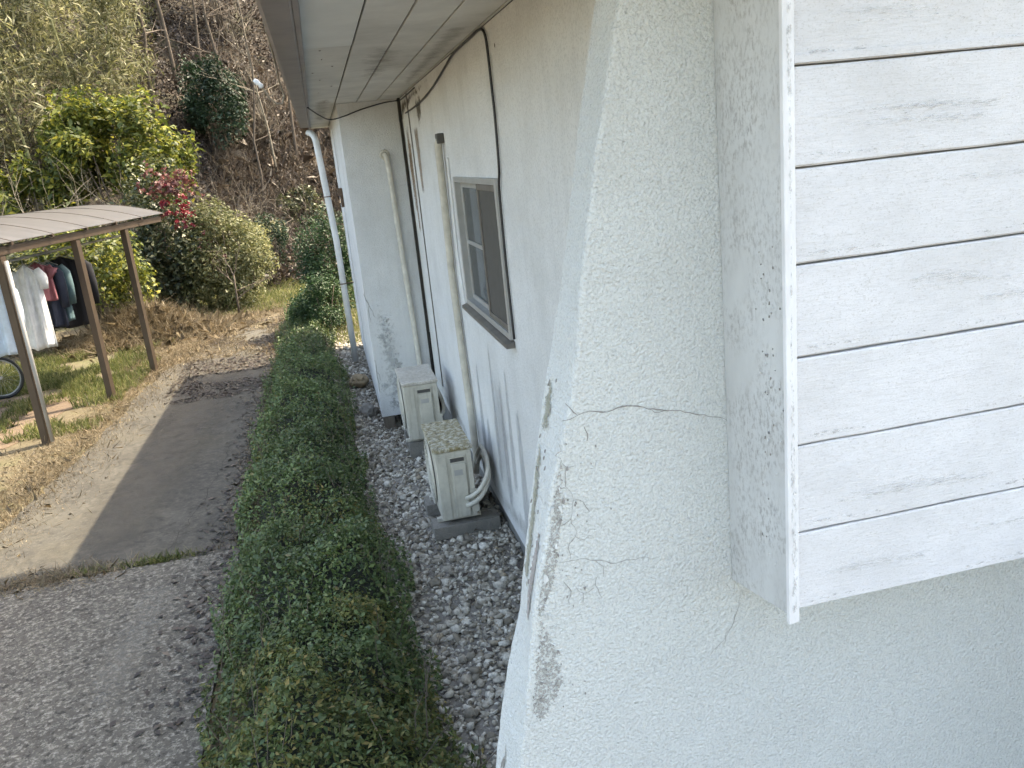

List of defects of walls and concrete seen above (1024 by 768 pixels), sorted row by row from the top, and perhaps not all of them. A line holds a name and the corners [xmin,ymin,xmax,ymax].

peeling [526,461,568,721]
crack [556,403,726,602]